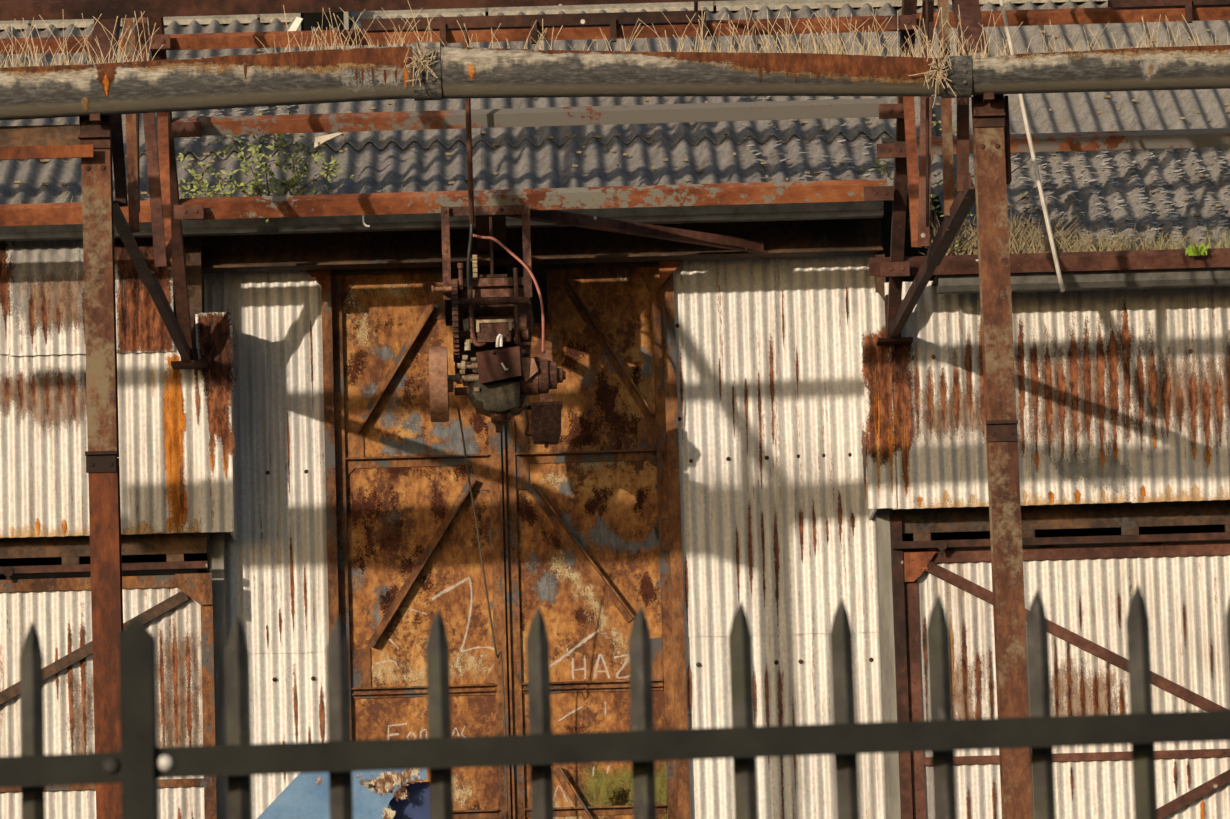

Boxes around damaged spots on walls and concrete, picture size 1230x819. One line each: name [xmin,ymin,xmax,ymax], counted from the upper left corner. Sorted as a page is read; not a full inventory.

corrosion [0,46,413,97]
corrosion [0,367,87,430]
corrosion [114,237,238,535]
corrosion [861,315,989,508]
corrosion [1015,304,1230,473]
corrosion [0,518,90,538]
corrosion [516,493,629,665]
peeling [524,477,662,621]
corrosion [736,500,780,632]
corrosion [798,490,855,560]
corrosion [55,602,95,754]
corrosion [949,614,994,719]